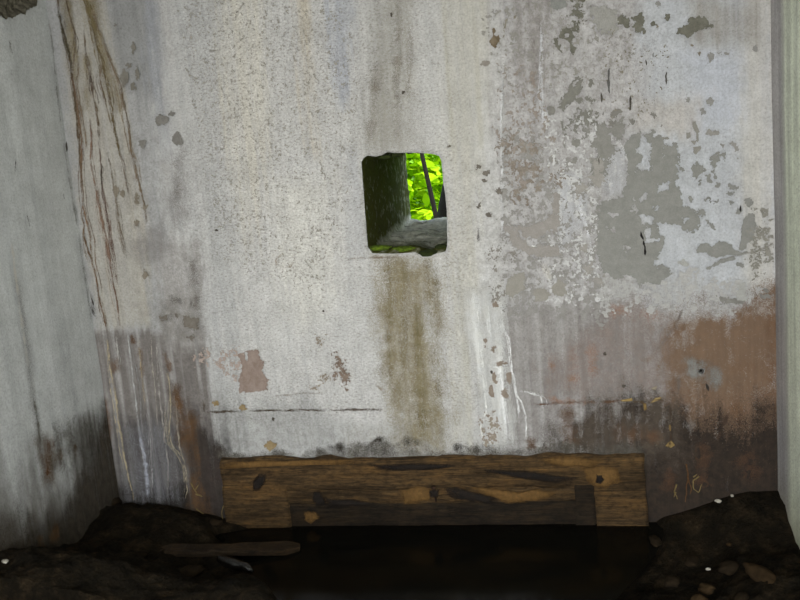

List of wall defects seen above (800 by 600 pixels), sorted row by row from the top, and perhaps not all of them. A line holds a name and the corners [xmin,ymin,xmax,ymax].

corrosion [49,0,148,333]
leakage [550,172,591,248]
leakage [596,145,627,199]
peeling [476,0,774,330]
peeling [192,346,269,394]
spalling [309,351,352,393]
leakage [0,242,778,551]
corrosion [637,275,777,456]